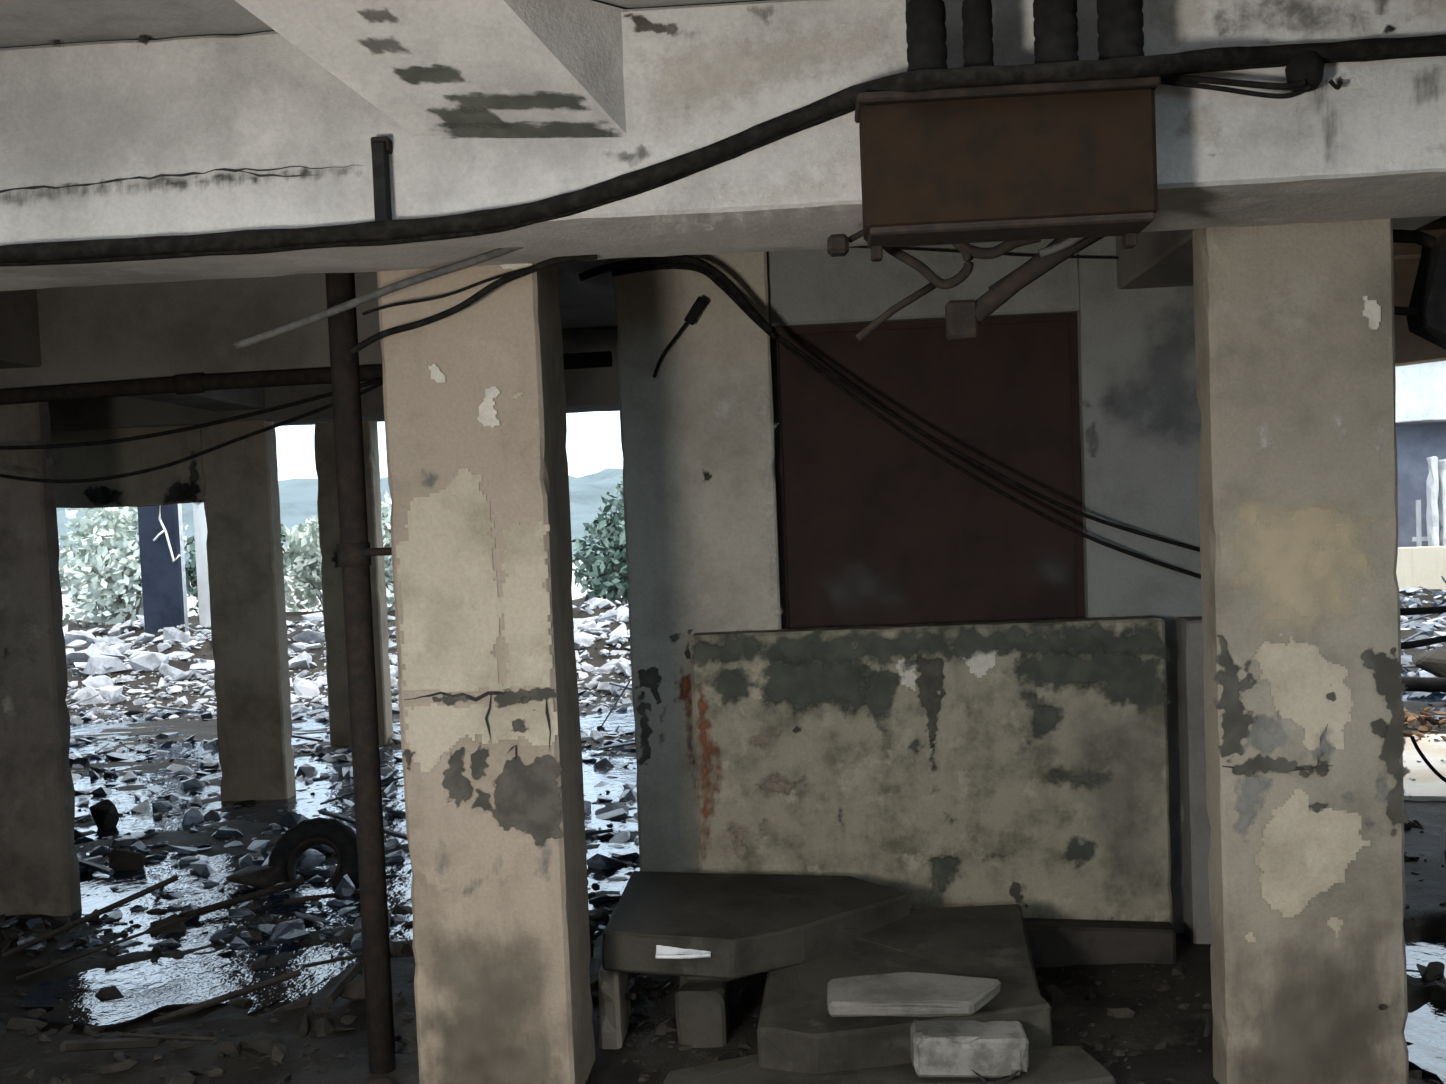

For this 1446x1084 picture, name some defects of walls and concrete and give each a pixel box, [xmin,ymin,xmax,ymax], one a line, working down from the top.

spalling [358,10,617,138]
peeling [396,468,563,846]
crack [404,687,558,761]
damp [636,667,663,765]
rust [679,676,720,849]
damp [669,620,1168,771]
damp [1048,767,1108,789]
peeling [1213,633,1410,918]
damp [929,856,961,892]
damp [1009,882,1028,908]
damp [1064,837,1095,867]
peeling [1327,917,1343,938]